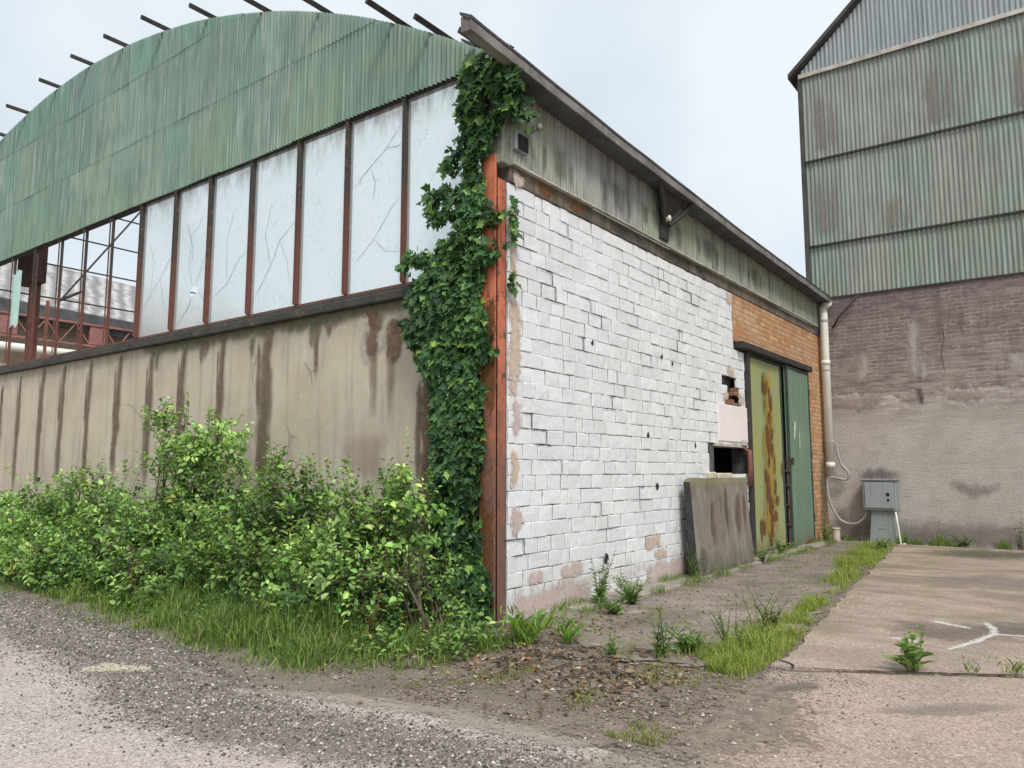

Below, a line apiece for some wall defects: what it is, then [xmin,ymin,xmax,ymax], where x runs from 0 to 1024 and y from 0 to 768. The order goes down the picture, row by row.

leakage [34,369,45,485]
leakage [54,367,66,475]
leakage [82,362,92,474]
leakage [110,356,122,471]
leakage [141,299,405,484]
rust [482,293,497,419]
peeling [506,231,523,436]
peeling [510,448,520,490]
peeling [510,506,525,536]
spalling [722,365,745,406]
rust [760,372,784,547]
peeling [512,561,592,618]